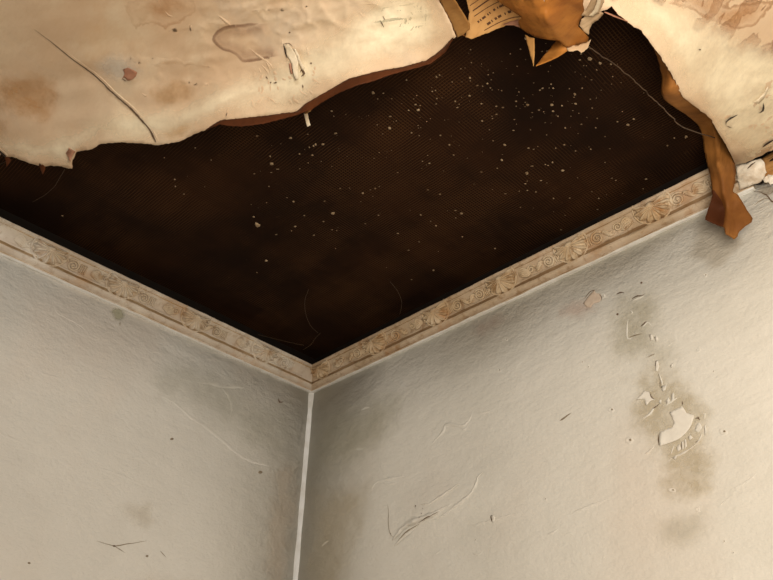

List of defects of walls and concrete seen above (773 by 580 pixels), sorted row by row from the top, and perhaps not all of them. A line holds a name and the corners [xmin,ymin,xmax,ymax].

peeling [122,68,137,81]
peeling [281,39,312,87]
flaking render [736,159,773,190]
spalling [636,353,707,463]